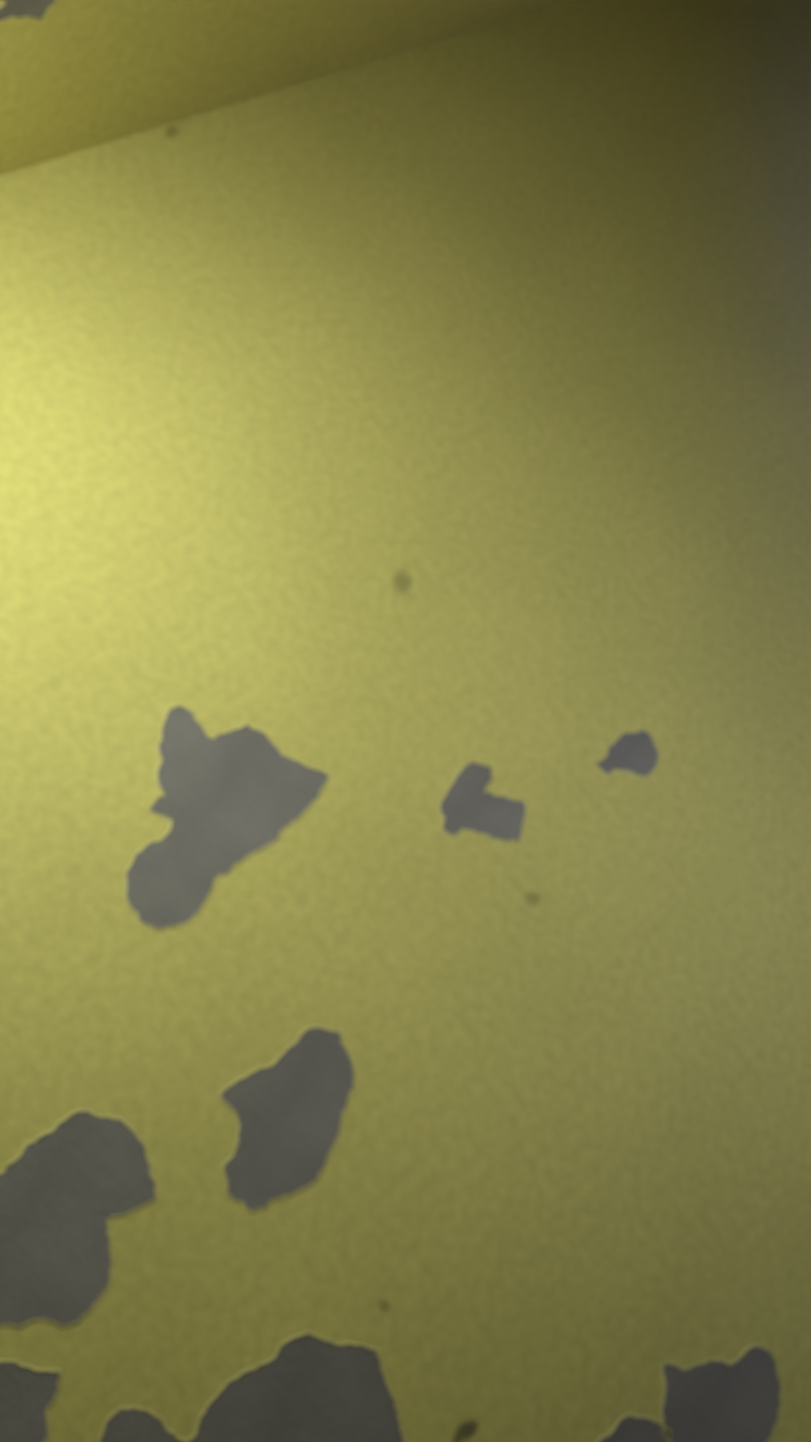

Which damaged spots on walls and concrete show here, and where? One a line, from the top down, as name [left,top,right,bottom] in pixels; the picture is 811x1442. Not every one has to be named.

peeling [0,0,56,23]
peeling [123,704,330,931]
peeling [438,760,527,844]
peeling [593,729,660,778]
peeling [218,1025,356,1214]
peeling [0,1109,158,1330]
peeling [0,1359,63,1442]
peeling [97,1331,406,1442]
peeling [597,1344,782,1442]